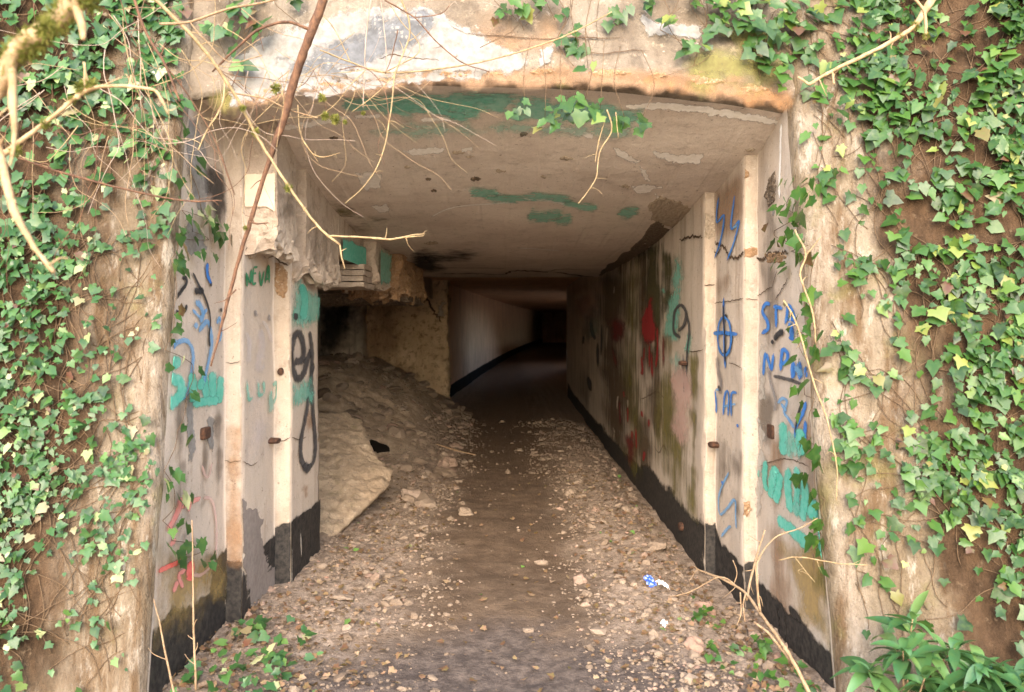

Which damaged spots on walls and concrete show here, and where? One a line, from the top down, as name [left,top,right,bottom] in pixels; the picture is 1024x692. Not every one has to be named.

flaking render [229,7,786,125]
flaking render [355,172,382,191]
spalling [599,148,691,276]
flaking render [653,151,703,164]
crack [679,212,788,303]
leakage [587,241,695,514]
leakage [170,557,225,612]